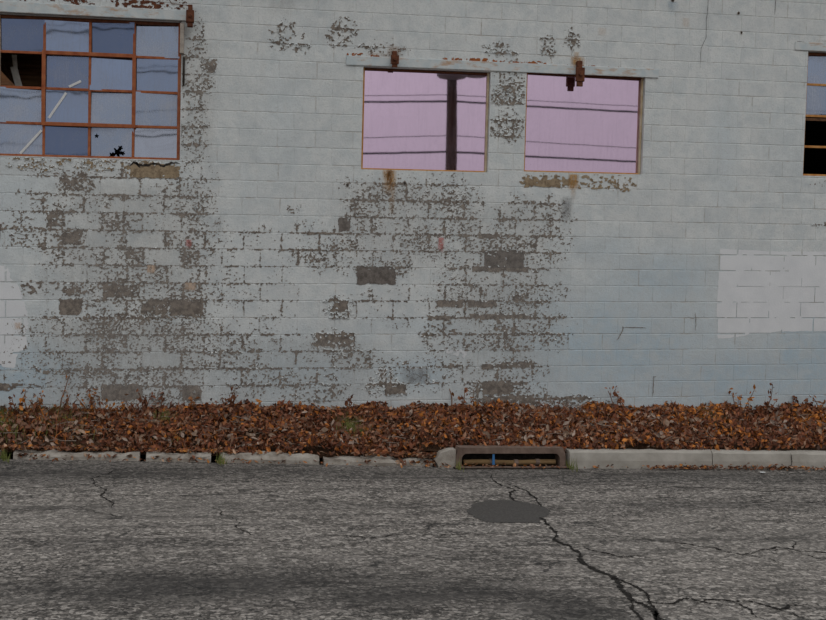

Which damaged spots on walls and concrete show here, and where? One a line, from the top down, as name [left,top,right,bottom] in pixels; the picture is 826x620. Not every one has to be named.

peeling [0,0,637,410]
crack [55,467,134,516]
crack [490,473,533,501]
crack [307,531,486,539]
crack [540,517,662,620]
crack [697,599,805,609]